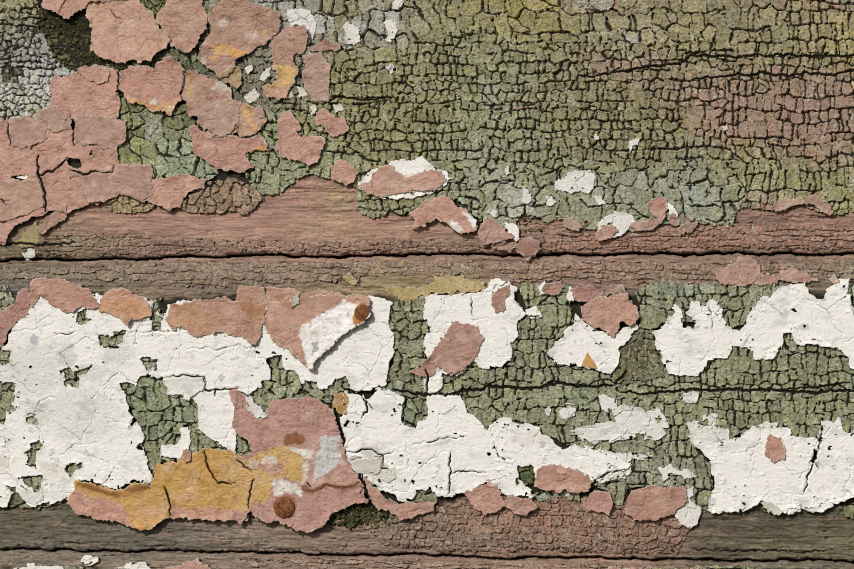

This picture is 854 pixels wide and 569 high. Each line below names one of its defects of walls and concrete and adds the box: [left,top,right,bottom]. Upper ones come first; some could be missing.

peeling [383,0,407,43]
crack [579,53,854,80]
crack [333,94,391,102]
peeling [0,0,361,261]
peeling [652,255,854,377]
peeling [0,272,670,533]
crack [393,369,854,397]
peeling [683,391,699,409]
crack [204,451,254,507]
peeling [624,413,854,529]
crack [804,428,822,491]
peeling [81,555,100,566]